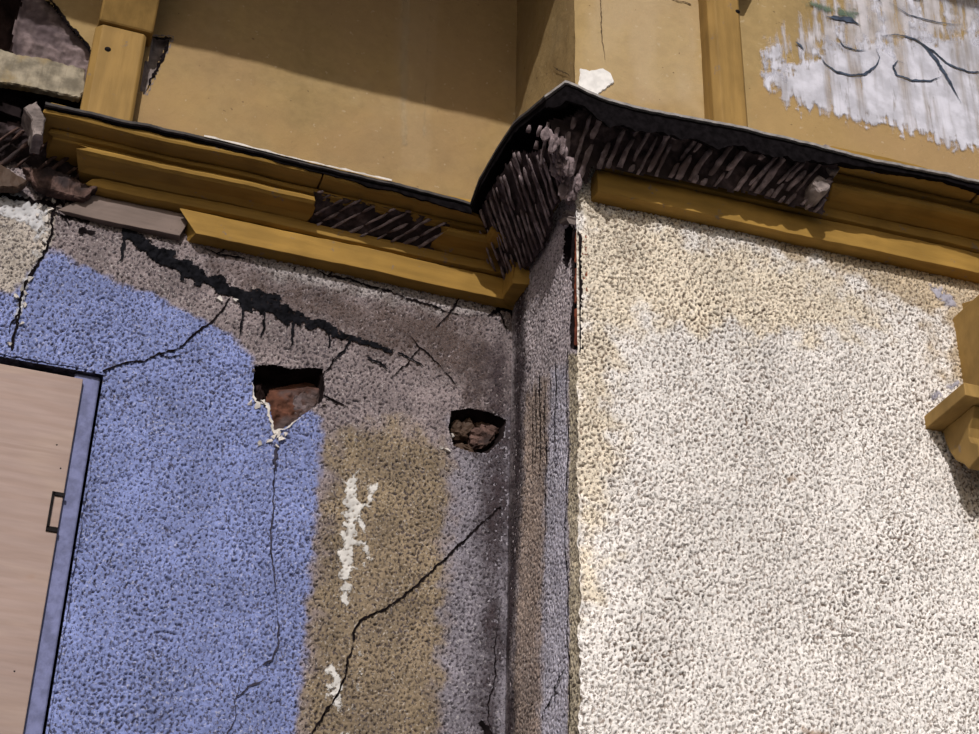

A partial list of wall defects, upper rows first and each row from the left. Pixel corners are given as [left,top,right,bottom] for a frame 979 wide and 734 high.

spalling [0,0,91,124]
flaking render [140,34,174,95]
peeling [0,193,48,256]
crack [0,192,96,350]
crack [102,228,455,409]
crack [315,268,512,335]
flaking render [559,210,588,352]
spalling [247,362,326,448]
spalling [439,406,511,454]
damp [482,292,526,734]
crack [227,447,280,734]
crack [312,506,501,734]